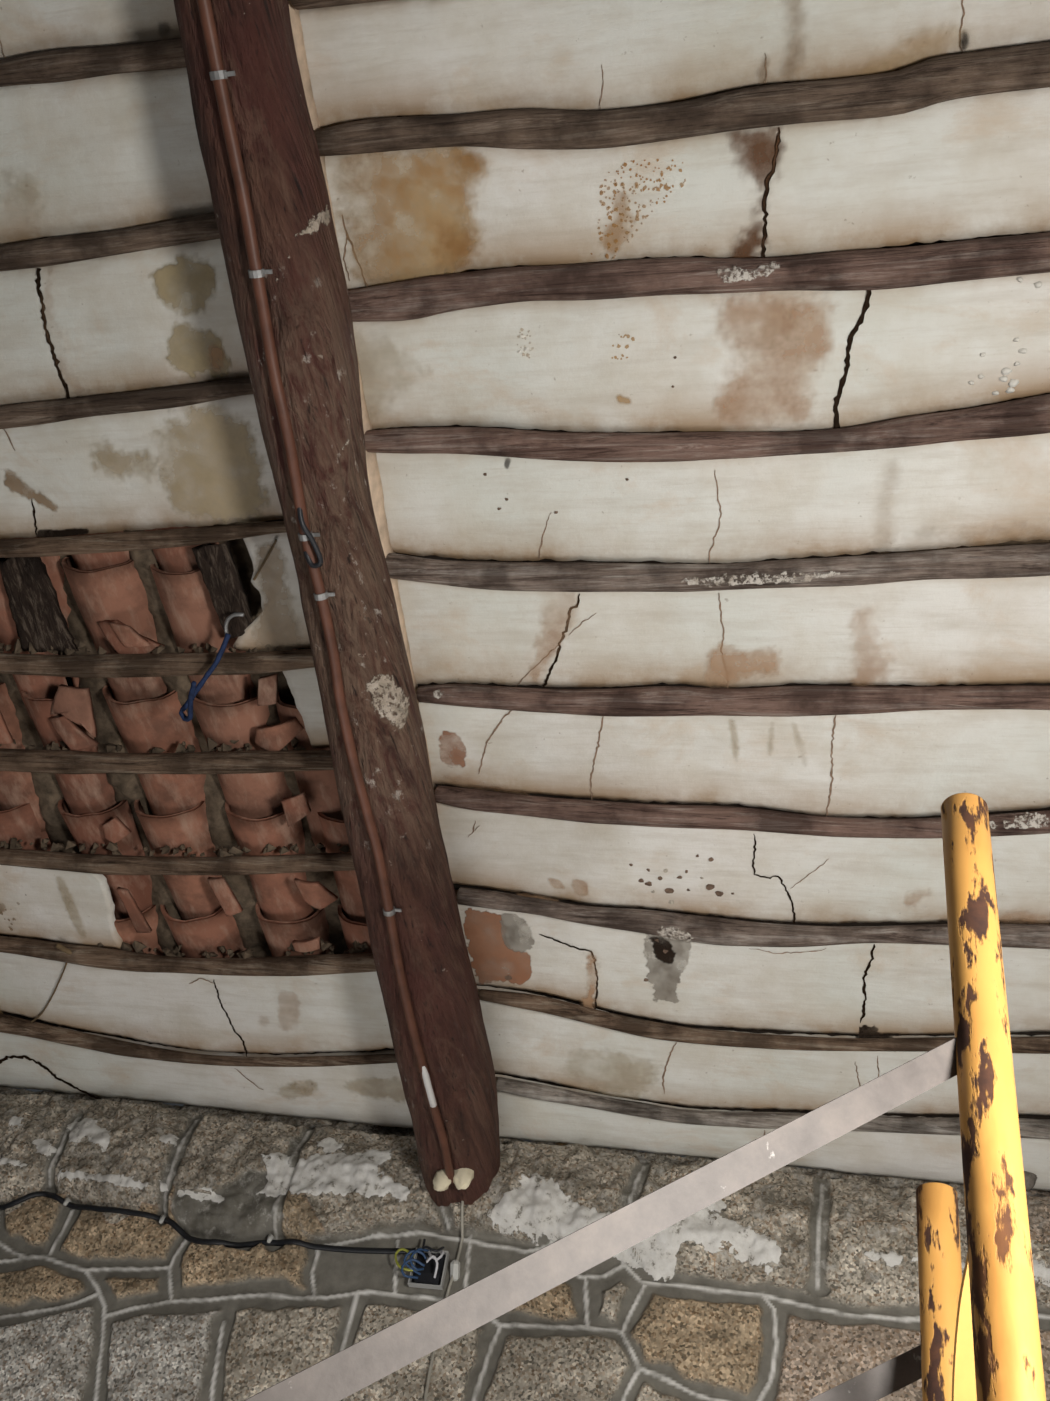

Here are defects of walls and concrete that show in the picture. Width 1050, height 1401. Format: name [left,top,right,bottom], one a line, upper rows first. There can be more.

water stain [354,148,481,281]
corrosion [590,159,686,259]
crack [762,127,781,258]
crack [35,268,70,399]
water stain [153,256,230,378]
crack [833,290,872,429]
water stain [96,449,148,474]
water stain [162,406,268,522]
crack [479,594,596,772]
spalling [463,908,534,985]
spalling [644,926,693,1003]
crack [752,835,828,954]